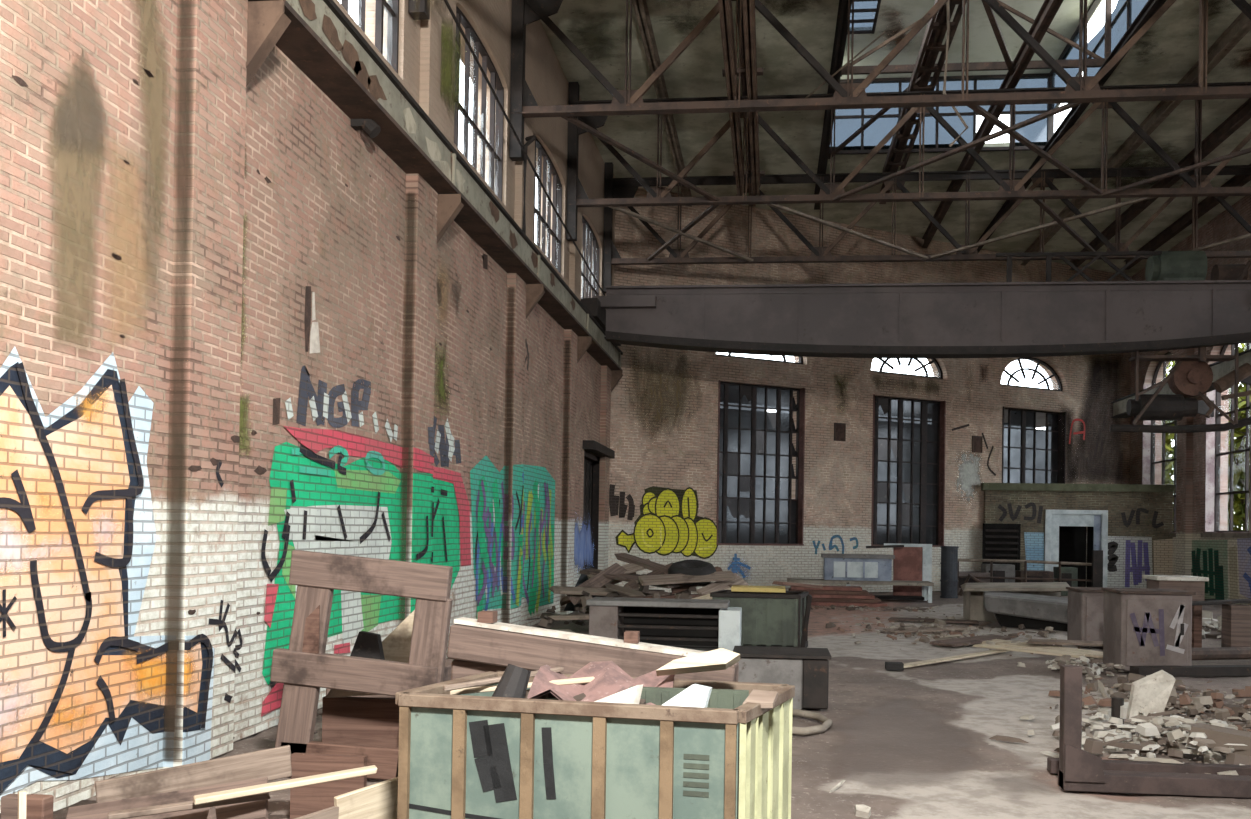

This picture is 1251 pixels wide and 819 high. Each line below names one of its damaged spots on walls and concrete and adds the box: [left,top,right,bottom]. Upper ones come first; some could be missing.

leakage [53,73,103,345]
leakage [137,0,192,262]
peeling [299,0,387,100]
peeling [403,108,465,193]
leakage [164,286,185,760]
leakage [633,356,691,432]